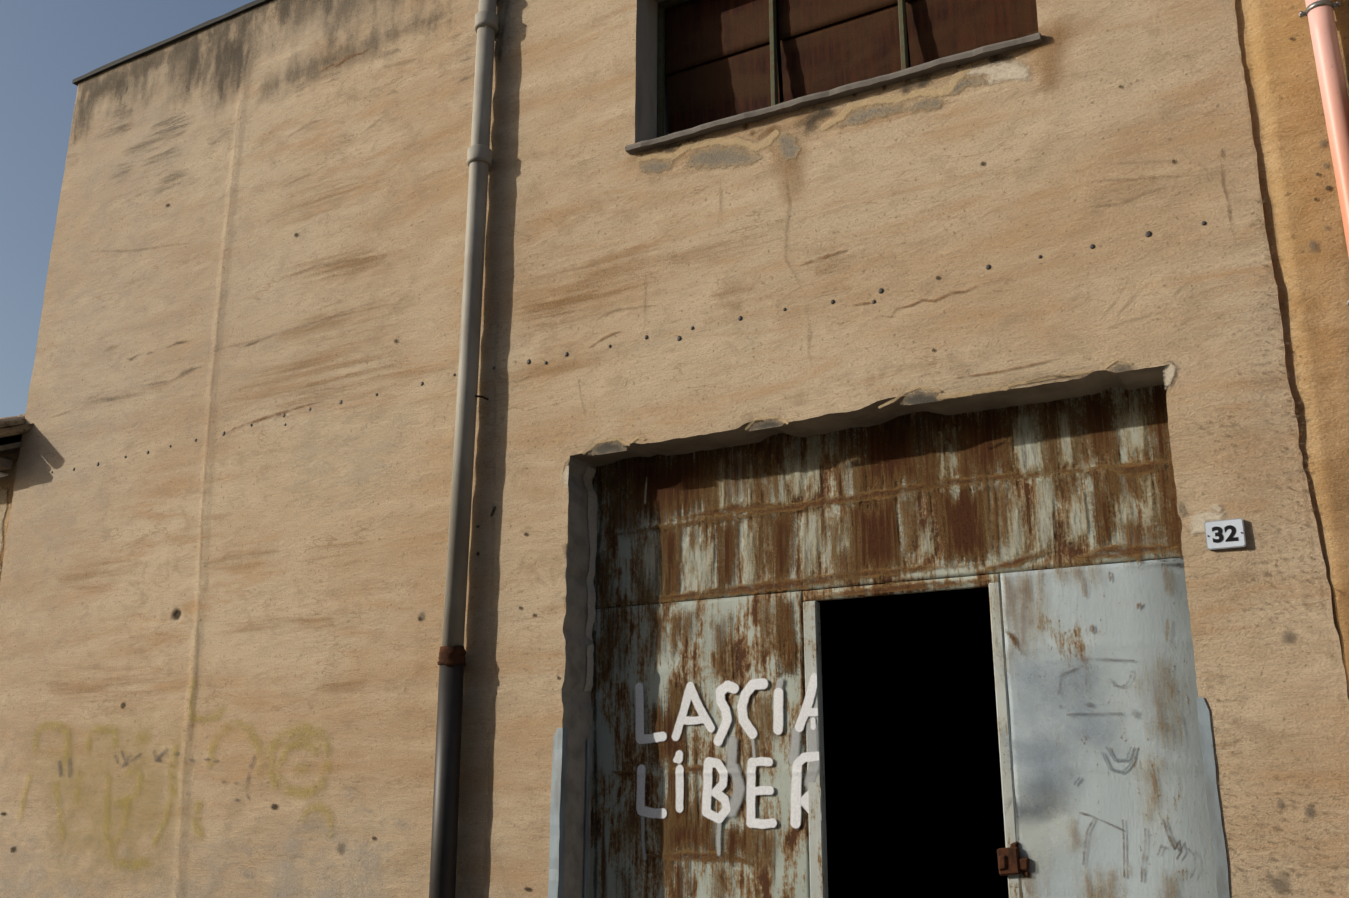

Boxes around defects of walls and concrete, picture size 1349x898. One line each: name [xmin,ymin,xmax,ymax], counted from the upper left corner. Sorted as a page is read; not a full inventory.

leakage [79,0,356,127]
spalling [636,124,801,173]
spalling [820,61,1029,130]
crack [902,290,968,308]
rust [595,385,1183,692]
rust [600,679,776,898]